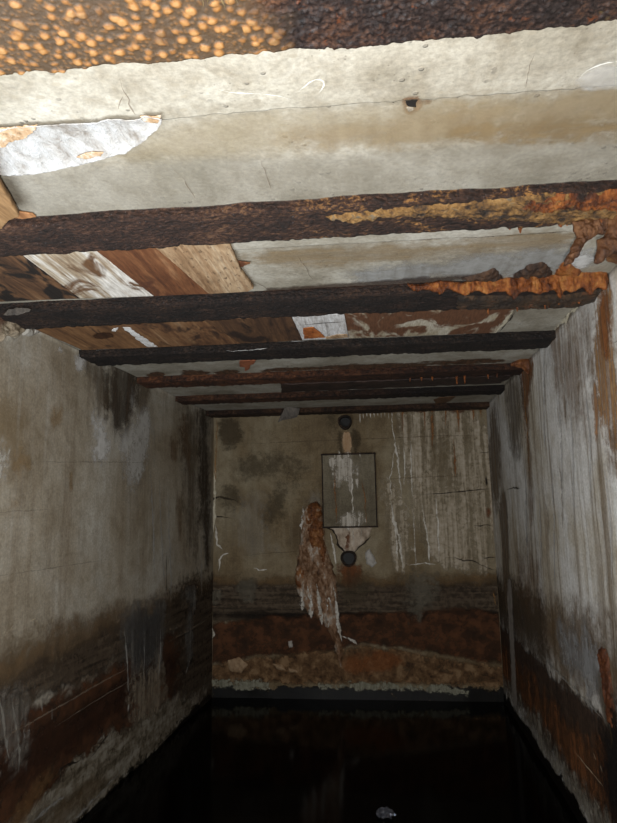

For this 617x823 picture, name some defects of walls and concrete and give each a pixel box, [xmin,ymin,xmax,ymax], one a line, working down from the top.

peeling [0,115,162,176]
spalling [0,317,40,342]
water stain [75,355,151,482]
corrosion [181,360,256,375]
corrosion [261,359,504,372]
corrosion [593,288,617,469]
water stain [0,396,617,823]
corrosion [295,501,357,667]
corrosion [597,647,616,738]